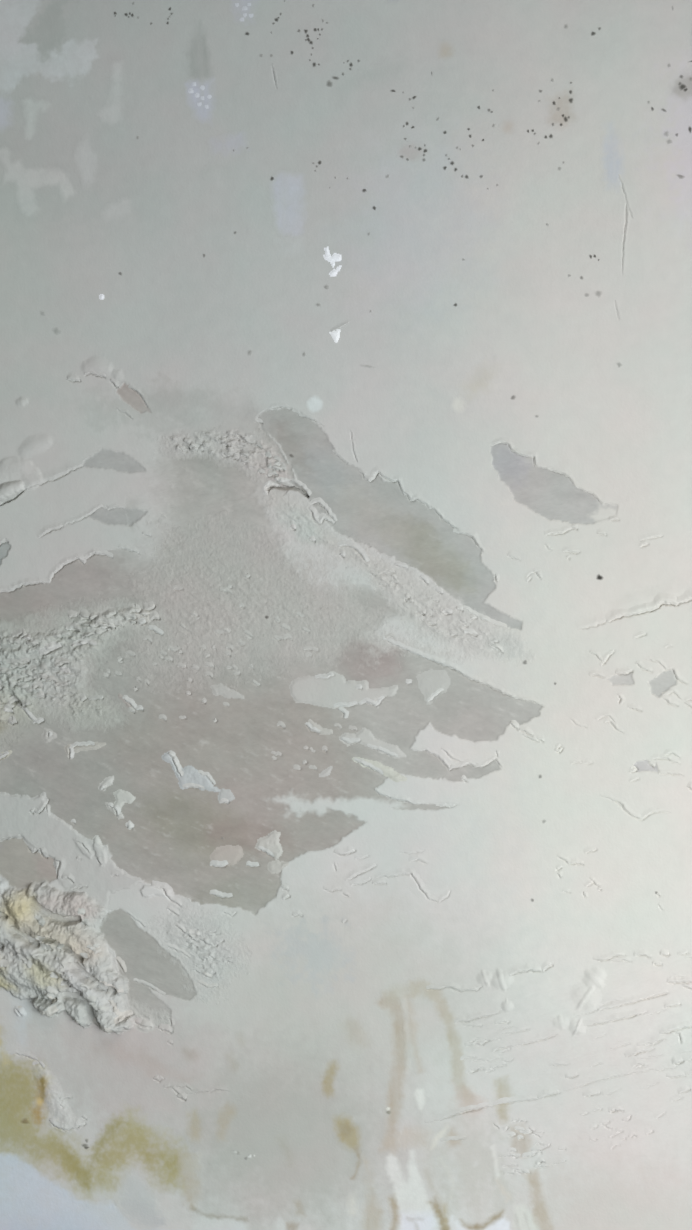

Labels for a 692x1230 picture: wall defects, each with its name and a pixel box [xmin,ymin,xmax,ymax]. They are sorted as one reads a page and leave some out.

damp [228,0,286,36]
damp [297,4,329,67]
damp [183,18,253,183]
damp [326,59,361,88]
damp [647,26,692,113]
damp [390,78,580,190]
peeling [67,371,149,419]
peeling [489,437,619,526]
peeling [0,403,545,1044]
crack [510,711,624,764]
crack [593,948,692,989]